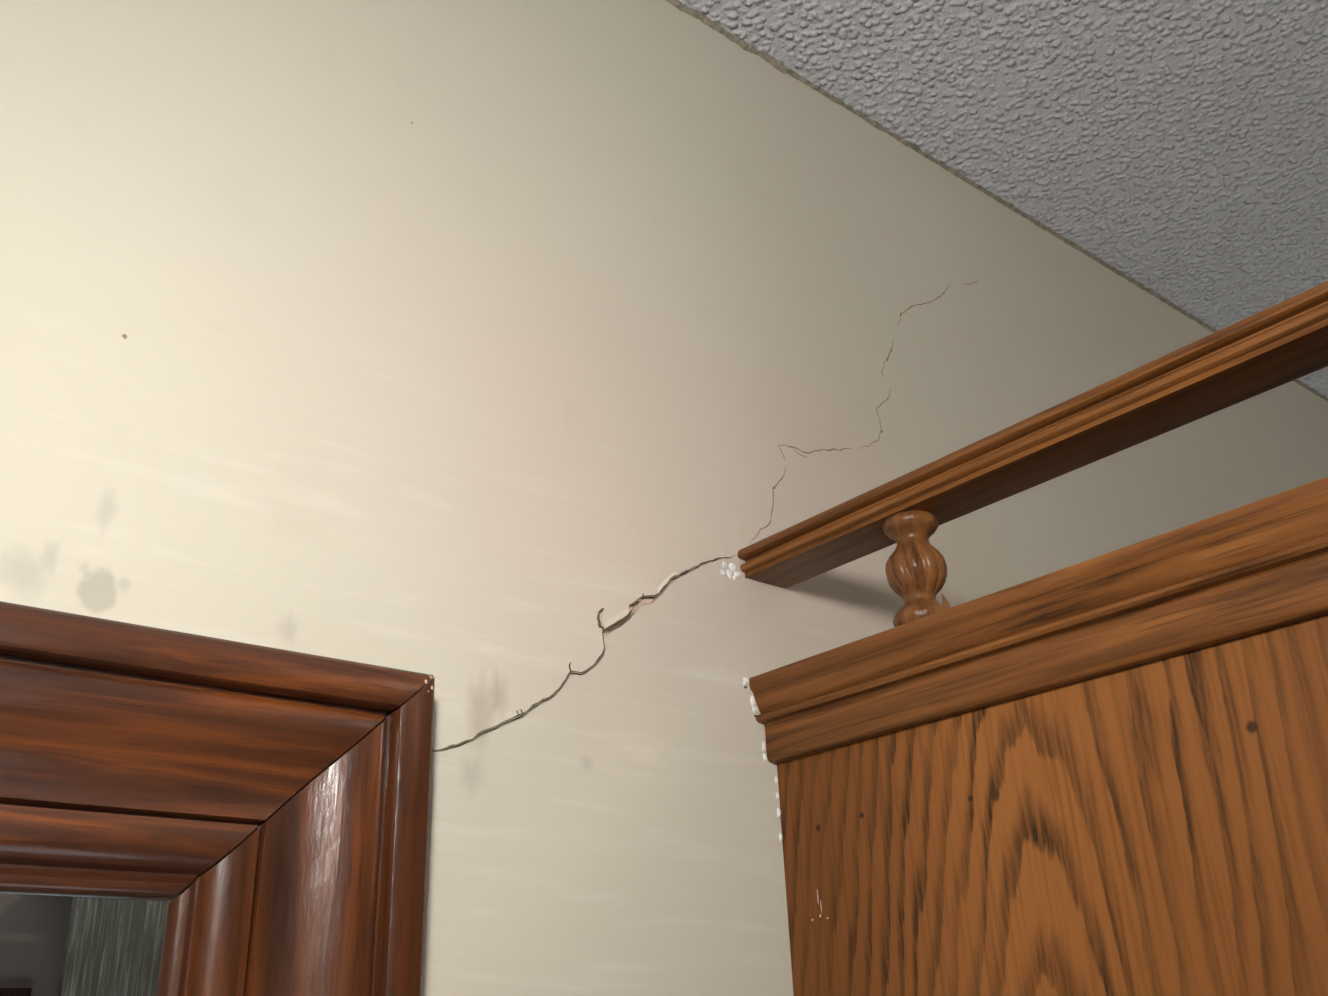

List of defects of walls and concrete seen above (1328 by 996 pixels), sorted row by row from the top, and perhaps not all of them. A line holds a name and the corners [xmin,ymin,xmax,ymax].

crack [432,282,975,752]